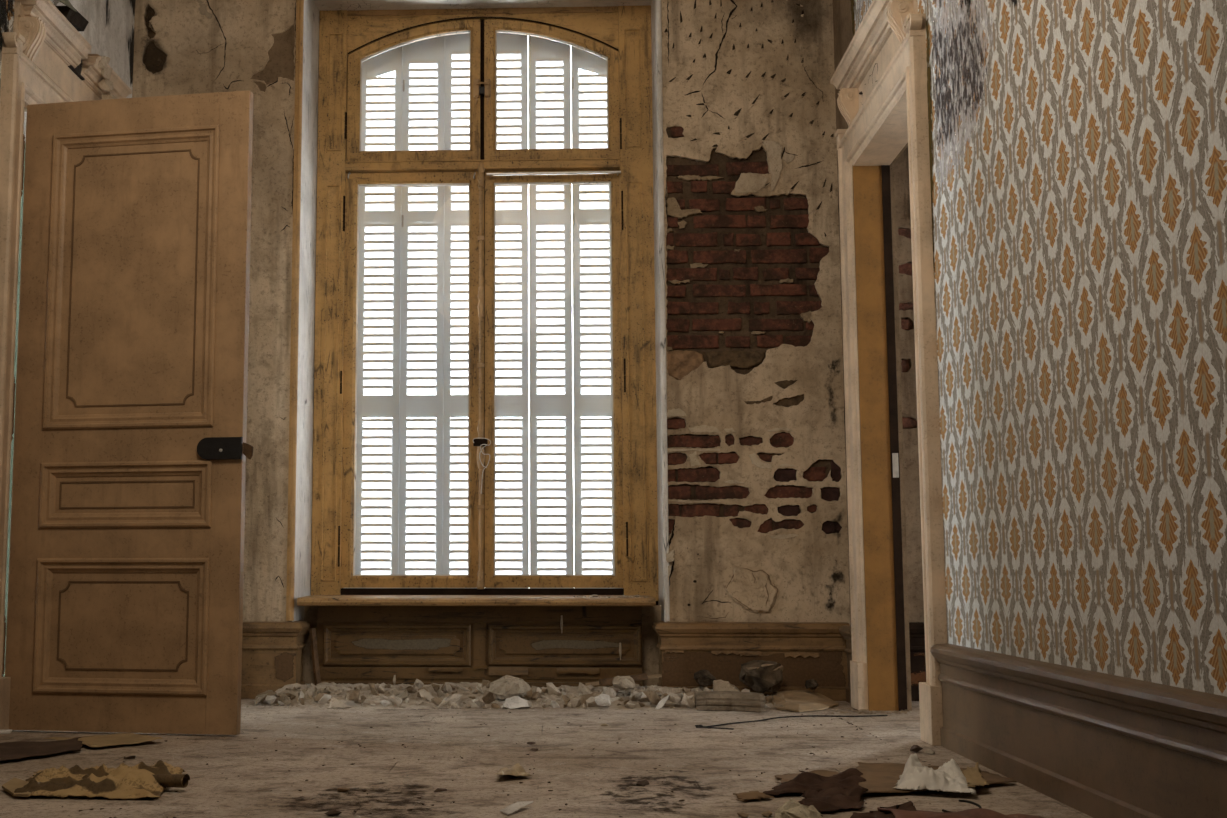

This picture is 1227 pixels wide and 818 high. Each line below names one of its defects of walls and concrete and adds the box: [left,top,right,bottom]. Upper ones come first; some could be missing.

water stain [0,0,14,51]
peeling [143,14,167,74]
flaking render [250,25,295,92]
crack [664,4,672,67]
crack [686,0,737,119]
water stain [926,0,987,266]
flaking render [664,0,834,380]
spalling [898,262,912,276]
spalling [899,303,914,331]
spalling [902,417,918,429]
spalling [667,408,842,539]